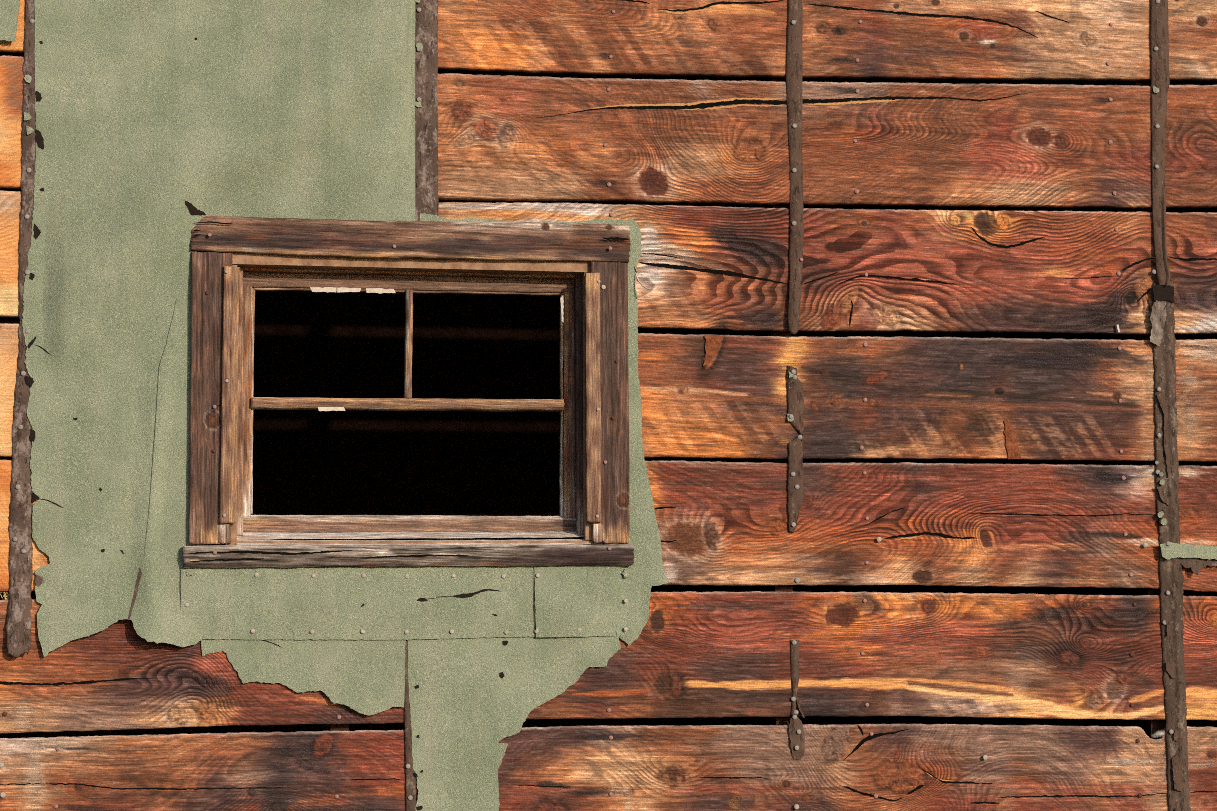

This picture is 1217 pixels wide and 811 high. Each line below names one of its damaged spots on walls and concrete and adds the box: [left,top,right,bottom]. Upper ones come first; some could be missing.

crack [626,0,1069,38]
crack [532,92,1031,119]
crack [972,228,1044,248]
crack [1065,257,1217,302]
crack [866,507,1153,540]
crack [843,725,1166,804]